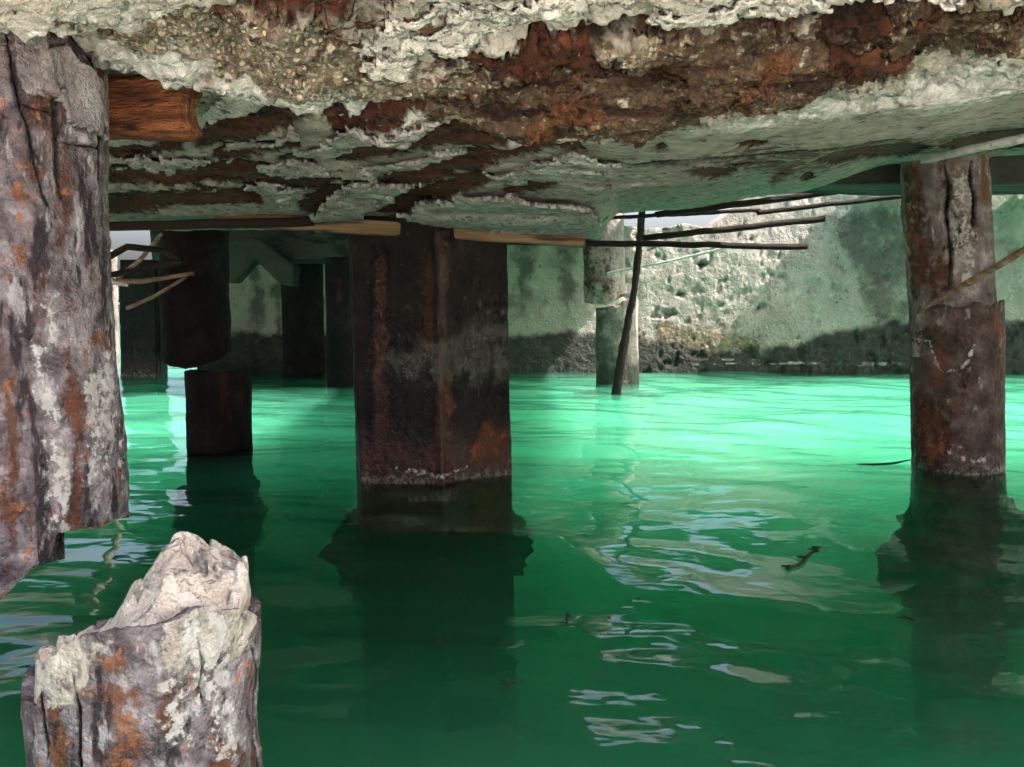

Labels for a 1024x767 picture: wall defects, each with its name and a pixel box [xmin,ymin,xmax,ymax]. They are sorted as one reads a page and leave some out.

spalling [247,0,356,29]
corrosion [404,16,446,35]
peeling [358,0,833,83]
peeling [873,0,966,12]
crack [5,36,100,207]
peeling [13,36,621,240]
corrosion [436,20,628,148]
crack [944,162,976,280]
corrosion [63,347,87,531]
corrosion [912,392,953,469]
corrosion [156,679,179,736]
corrosion [210,741,245,767]